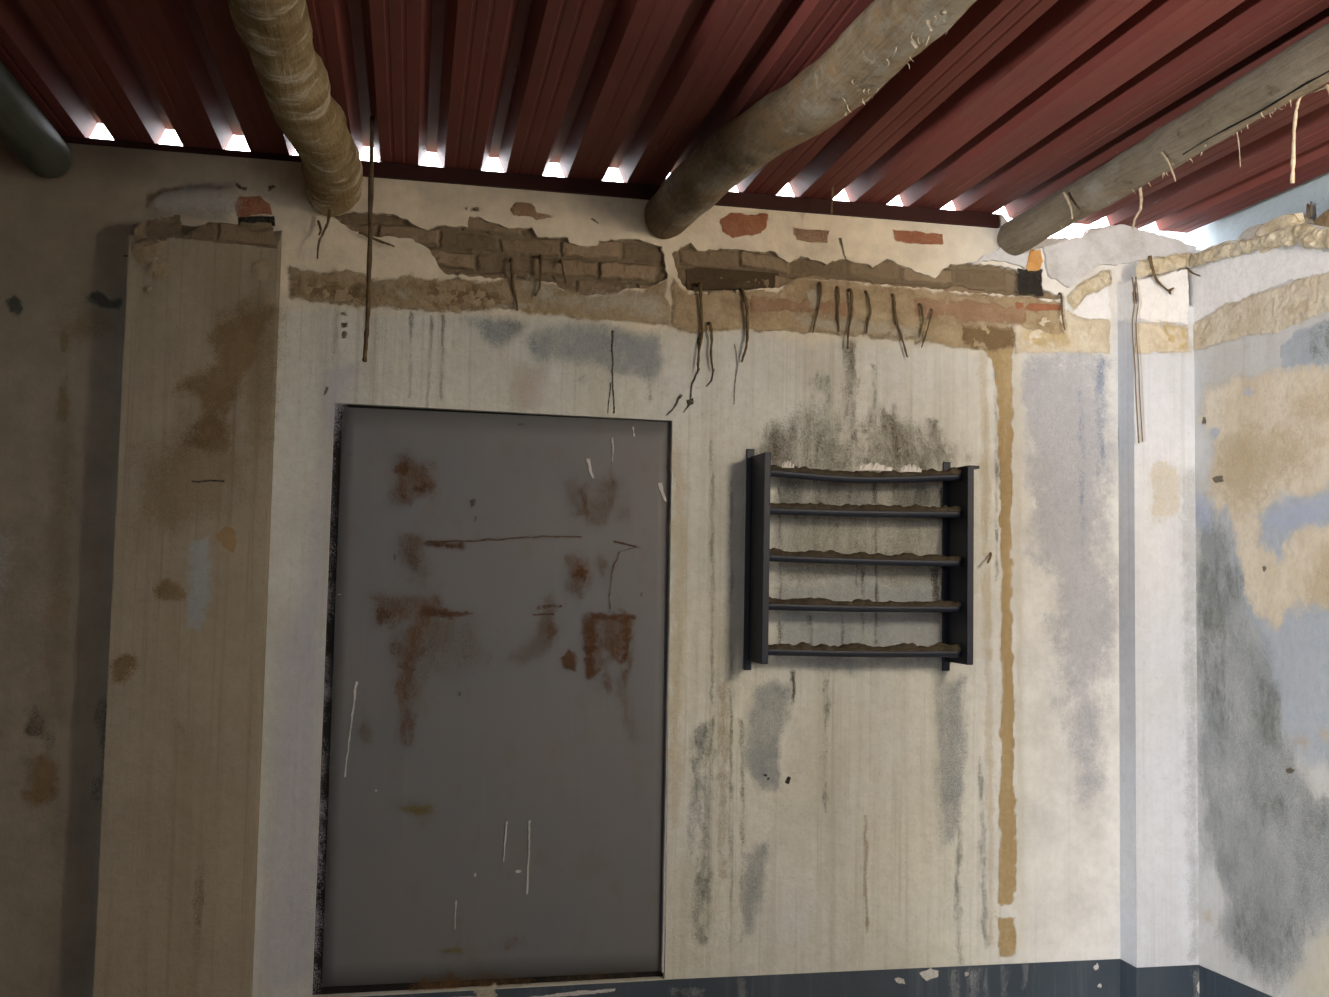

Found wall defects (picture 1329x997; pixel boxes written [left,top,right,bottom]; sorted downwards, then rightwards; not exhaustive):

flaking render [134,180,277,250]
flaking render [287,202,1112,355]
flaking render [1134,272,1329,368]
flaking render [1136,209,1329,279]
corrosion [508,549,641,741]
leakage [664,327,1029,964]
leakage [1176,466,1329,996]